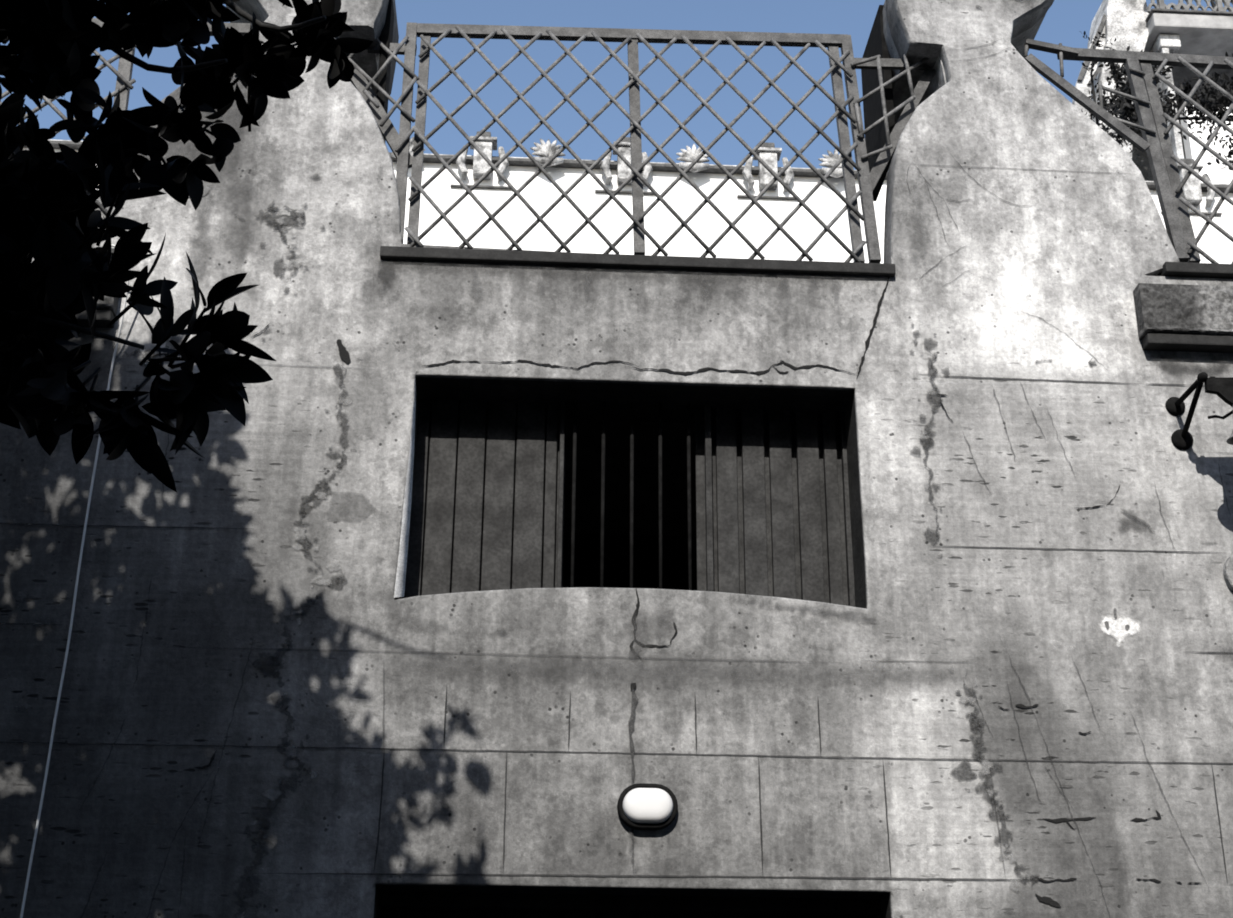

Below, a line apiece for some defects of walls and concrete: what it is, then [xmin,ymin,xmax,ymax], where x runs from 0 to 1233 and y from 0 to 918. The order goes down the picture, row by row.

crack [423,276,890,377]
crack [630,589,677,657]
crack [998,703,1038,711]